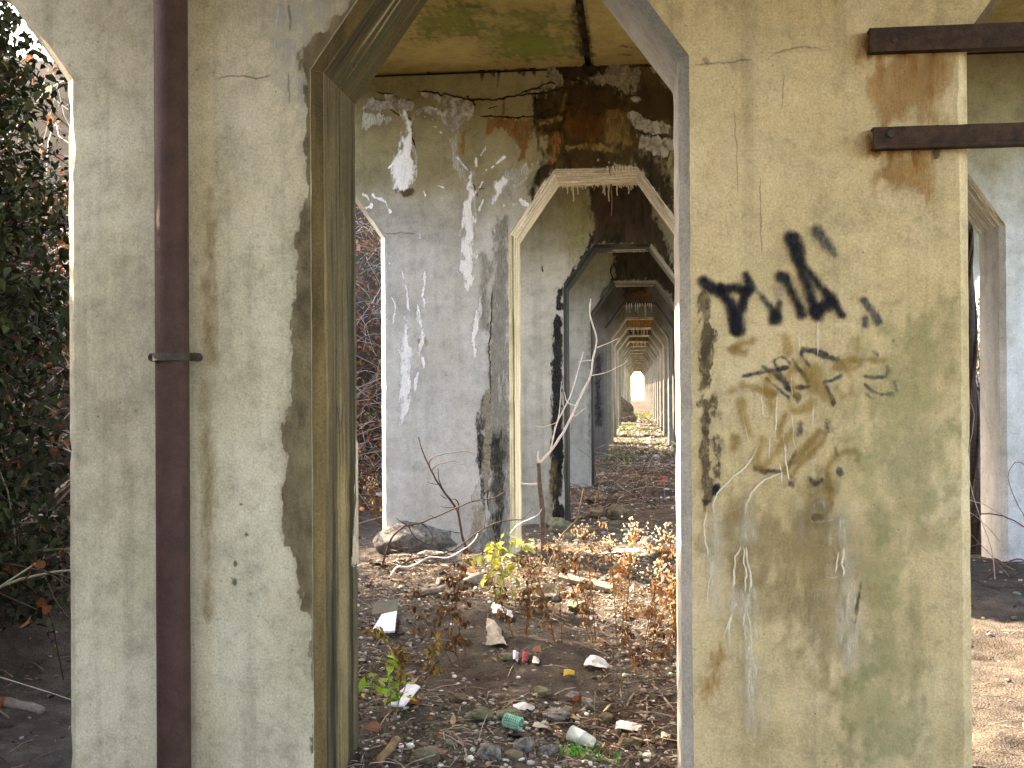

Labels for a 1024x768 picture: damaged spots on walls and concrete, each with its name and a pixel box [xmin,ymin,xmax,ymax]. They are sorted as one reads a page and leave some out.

damp [388,108,426,197]
spalling [362,92,474,132]
crack [362,67,671,150]
spalling [522,67,563,97]
corrosion [486,93,636,168]
spalling [588,64,641,95]
damp [362,193,392,213]
damp [452,4,675,555]
damp [391,271,426,426]
damp [696,290,795,721]
damp [835,518,861,661]